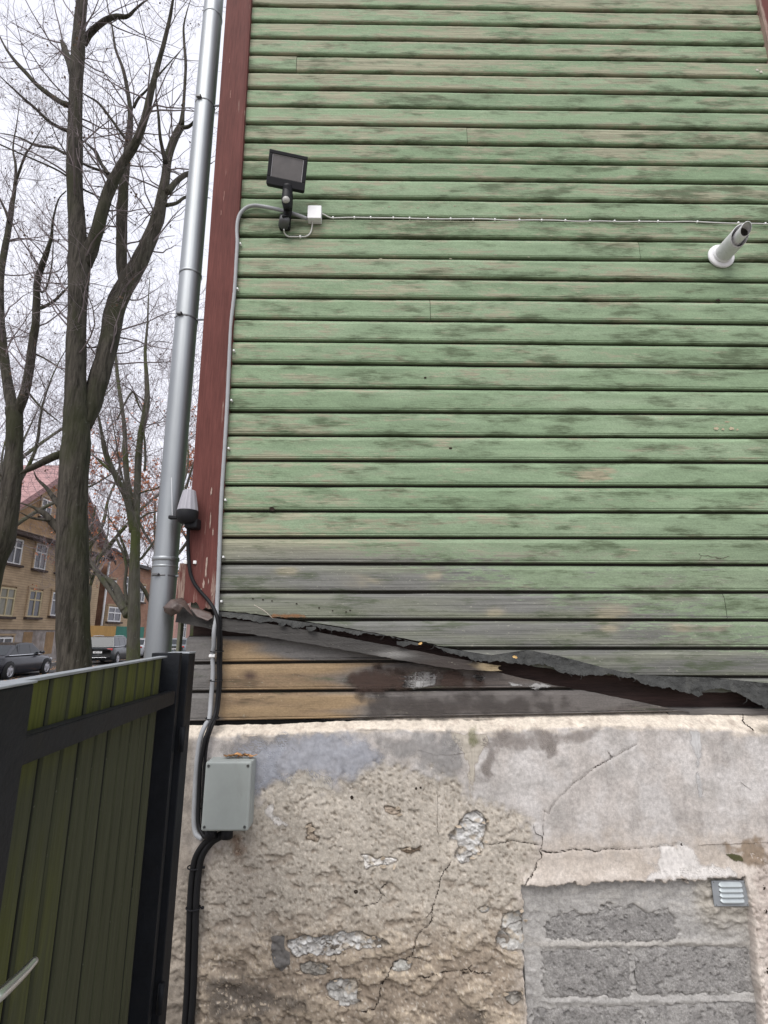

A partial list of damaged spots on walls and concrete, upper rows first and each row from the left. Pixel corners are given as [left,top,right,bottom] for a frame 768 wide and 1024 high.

water stain [346,664,568,719]
water stain [567,729,595,741]
water stain [381,729,555,797]
spalling [361,846,421,870]
spalling [449,810,489,863]
crack [487,803,675,885]
crack [361,860,491,1013]
spalling [496,910,528,954]
spalling [287,931,387,1010]